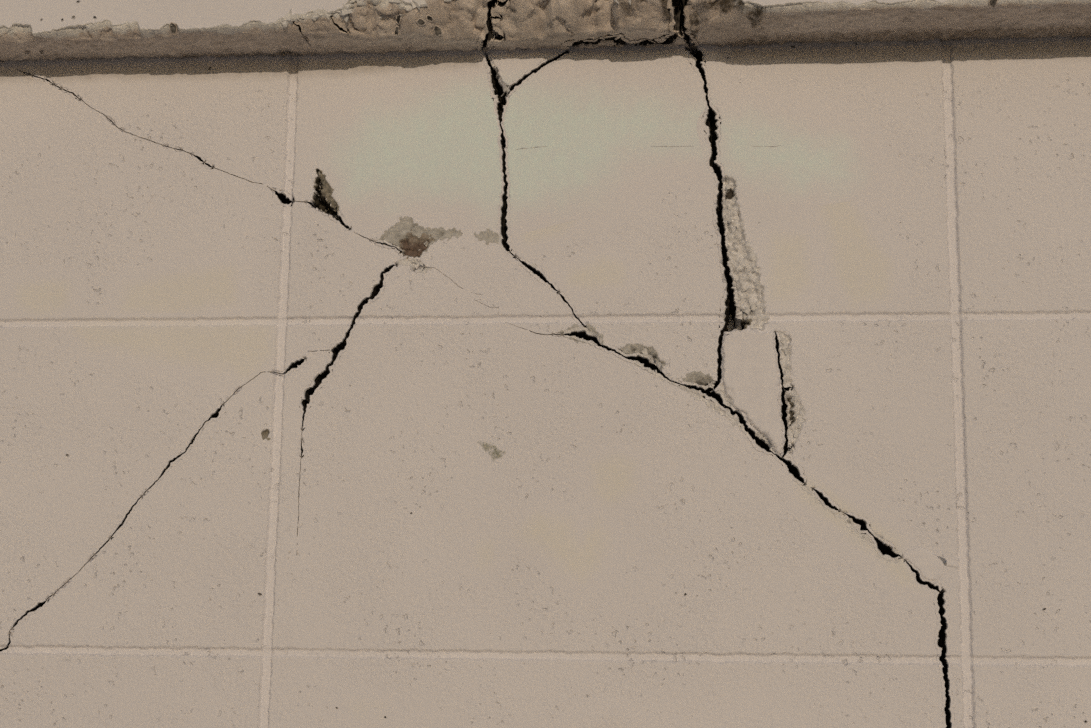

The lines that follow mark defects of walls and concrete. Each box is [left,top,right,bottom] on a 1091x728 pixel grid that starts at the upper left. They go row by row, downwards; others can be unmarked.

crack [294,21,311,46]
spalling [0,0,670,54]
crack [330,17,348,34]
spalling [689,0,1091,31]
flaking render [313,169,339,216]
flaking render [376,216,499,273]
flaking render [724,174,770,330]
crack [0,69,402,654]
crack [415,0,955,728]
flaking render [779,331,806,455]